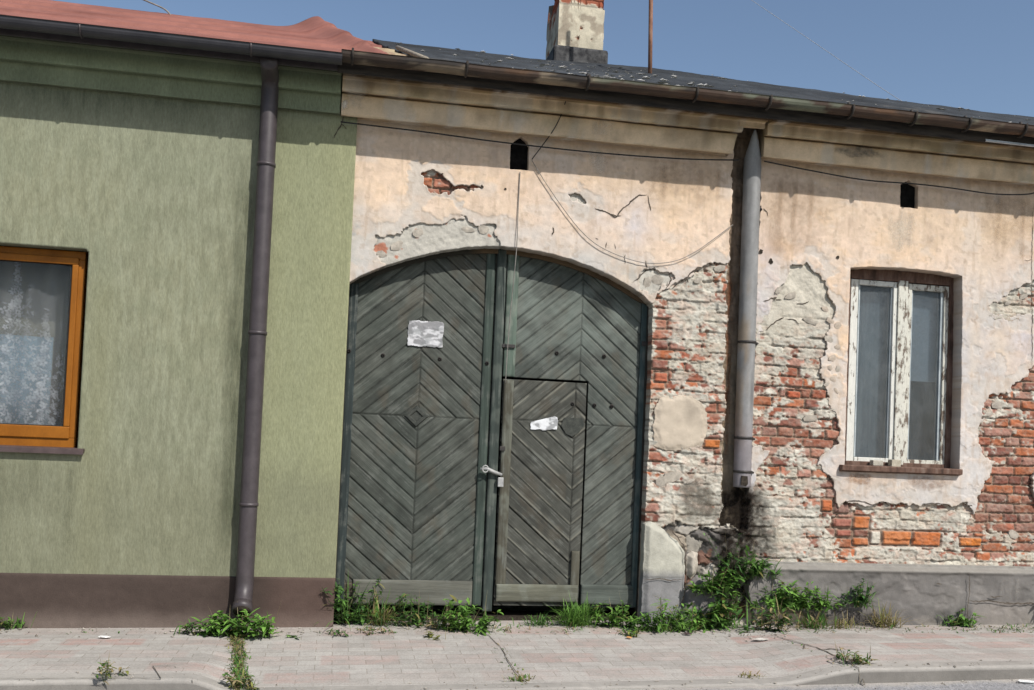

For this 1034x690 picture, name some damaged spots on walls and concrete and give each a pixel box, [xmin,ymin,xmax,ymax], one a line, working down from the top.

flaking render [421,170,484,195]
crack [595,194,651,218]
peeling [373,215,504,269]
crack [596,238,717,290]
flaking render [634,262,1034,624]
water stain [684,481,770,612]